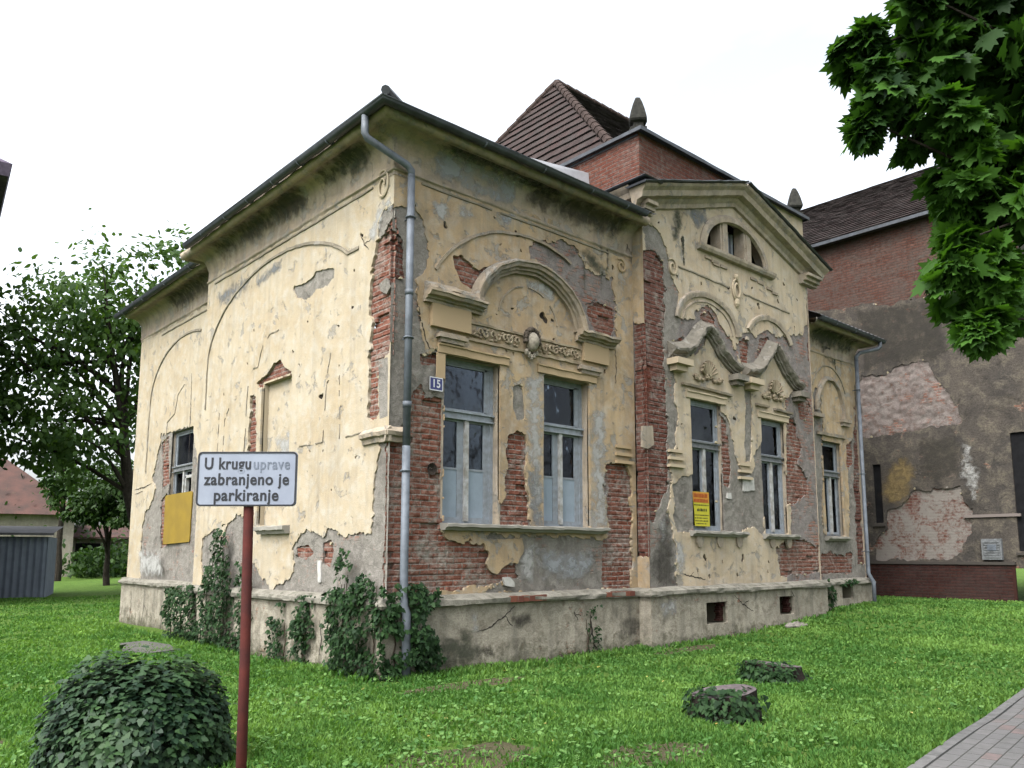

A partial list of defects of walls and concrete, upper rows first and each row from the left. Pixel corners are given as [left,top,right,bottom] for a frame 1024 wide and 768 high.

flaking render [139,200,977,602]
crack [479,606,515,631]